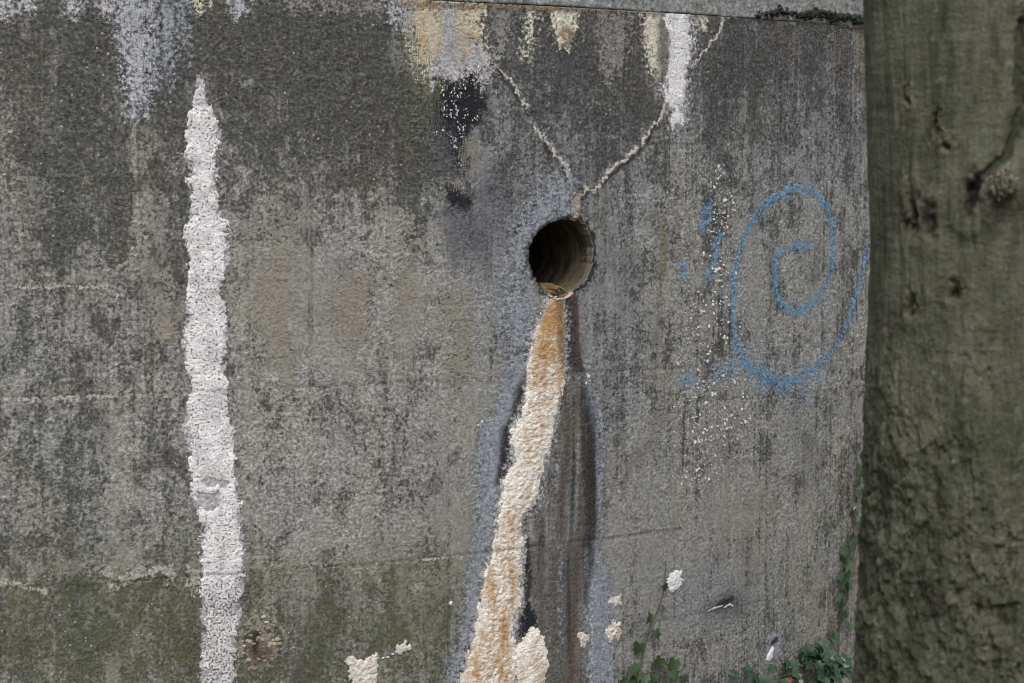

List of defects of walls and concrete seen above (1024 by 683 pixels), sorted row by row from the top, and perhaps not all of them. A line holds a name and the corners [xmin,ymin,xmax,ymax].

damp [109,0,248,683]
damp [379,0,708,683]
crack [496,65,666,221]
crack [687,17,725,69]